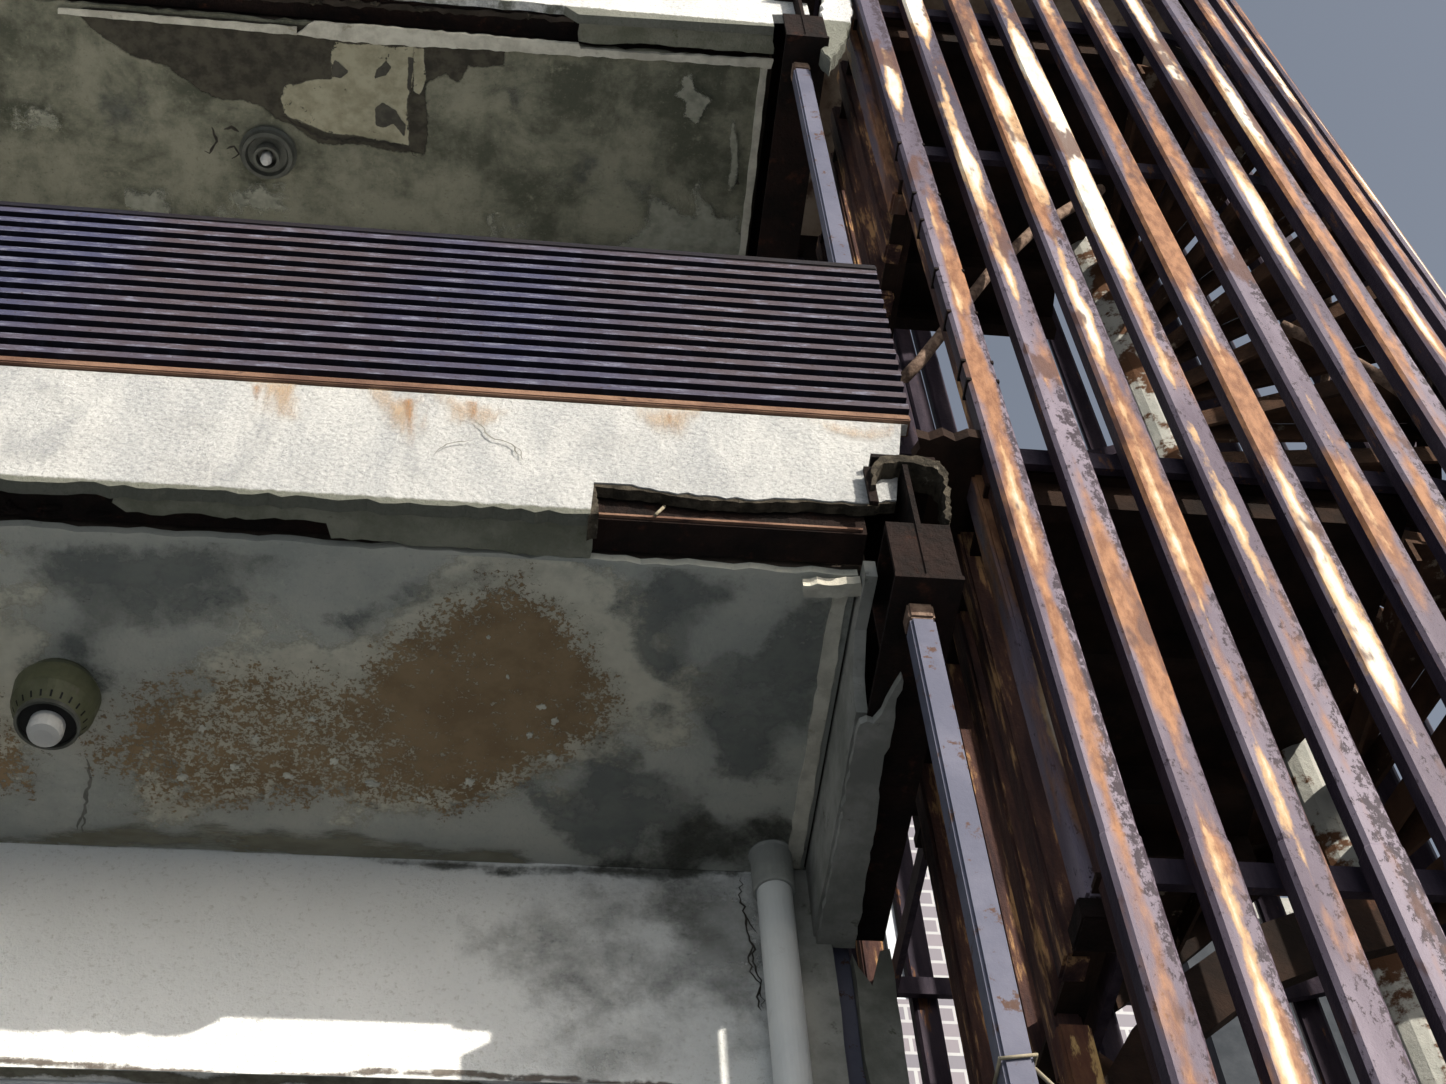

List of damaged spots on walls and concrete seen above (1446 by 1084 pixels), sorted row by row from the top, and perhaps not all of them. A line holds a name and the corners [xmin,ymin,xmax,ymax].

spalling [250,0,574,22]
peeling [12,108,58,129]
peeling [80,7,505,157]
water stain [42,548,267,626]
water stain [611,569,731,683]
water stain [704,602,830,779]
water stain [423,751,792,975]
crack [738,878,765,1011]